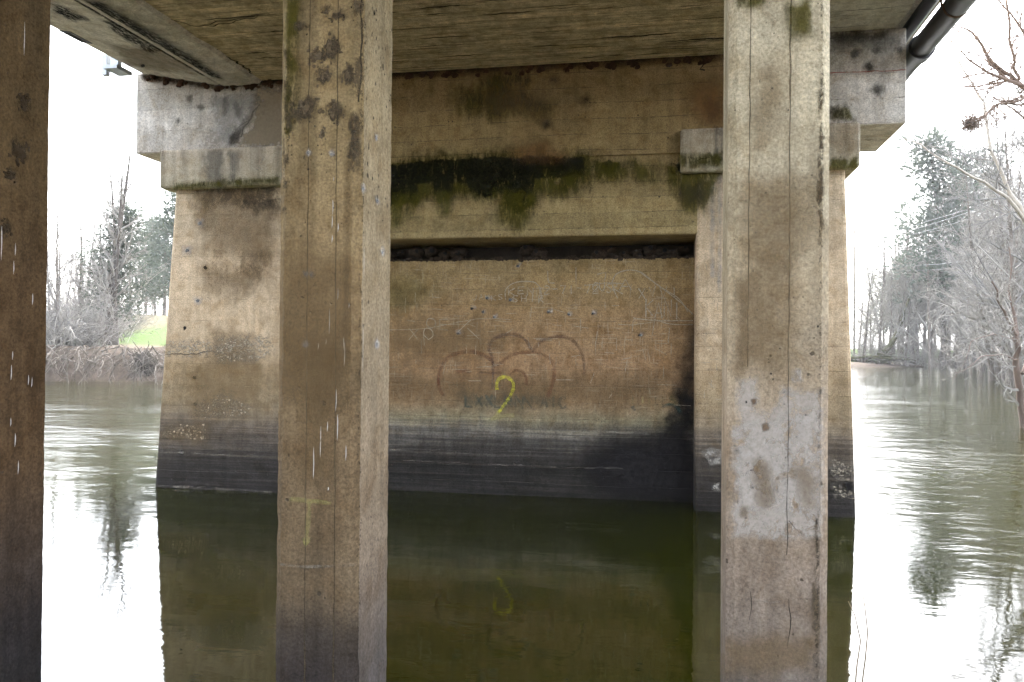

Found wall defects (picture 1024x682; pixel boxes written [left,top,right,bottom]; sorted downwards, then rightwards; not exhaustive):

water stain [679,153,722,169]
water stain [831,157,857,168]
water stain [467,171,534,212]
crack [786,0,802,555]
water stain [584,338,694,503]